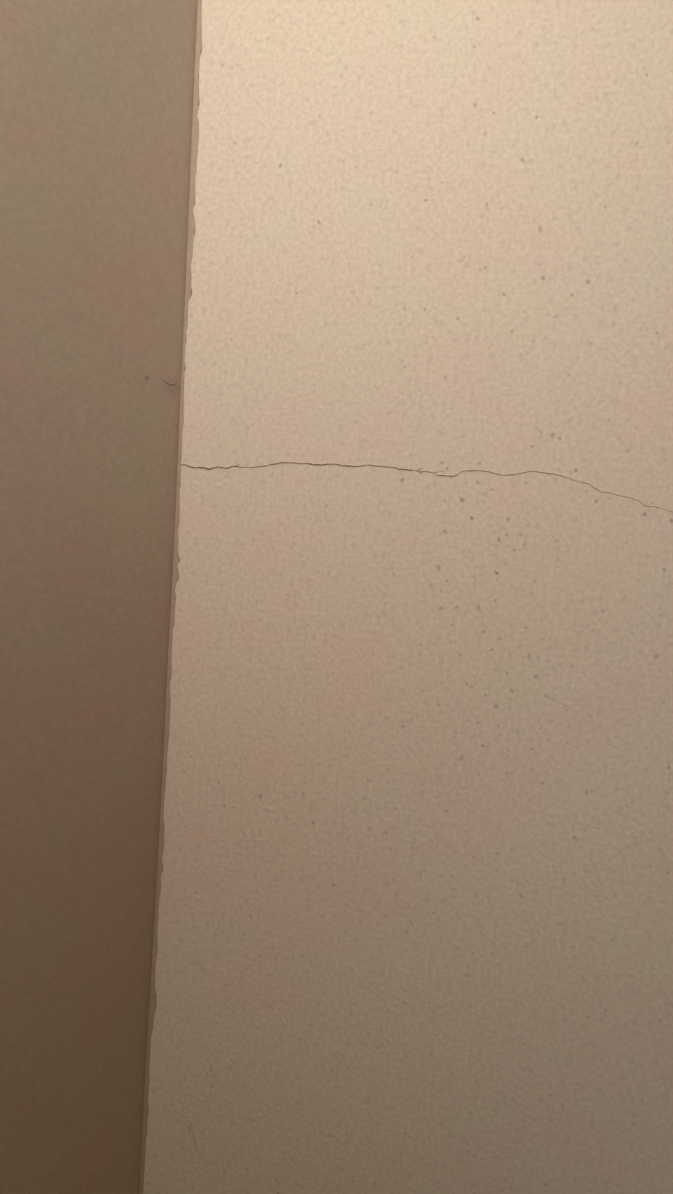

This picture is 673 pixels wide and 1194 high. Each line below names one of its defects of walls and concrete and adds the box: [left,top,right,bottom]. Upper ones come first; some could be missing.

crack [139,0,673,1194]